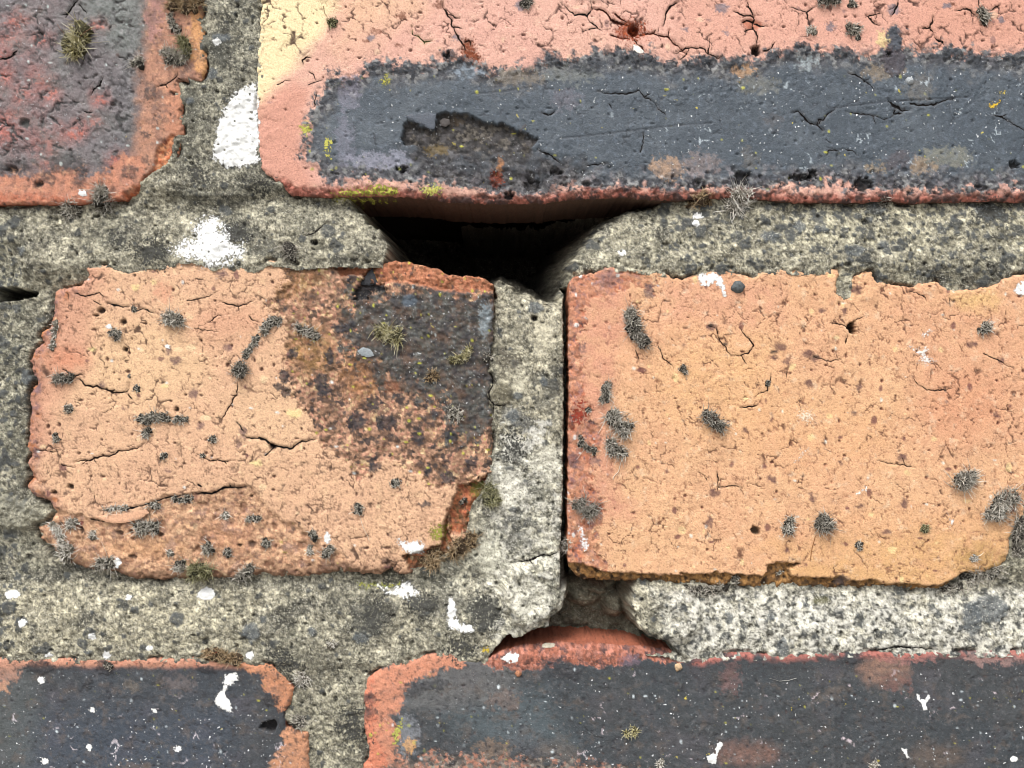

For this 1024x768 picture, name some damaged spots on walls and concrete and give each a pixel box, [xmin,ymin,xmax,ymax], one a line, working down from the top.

crack [442,3,471,55]
crack [565,1,722,59]
crack [735,2,775,52]
crack [865,0,899,26]
spalling [402,112,538,173]
crack [605,90,666,115]
crack [794,74,951,154]
crack [63,369,132,399]
crack [221,383,315,456]
crack [39,447,139,467]
spalling [541,267,954,653]
crack [91,458,242,522]